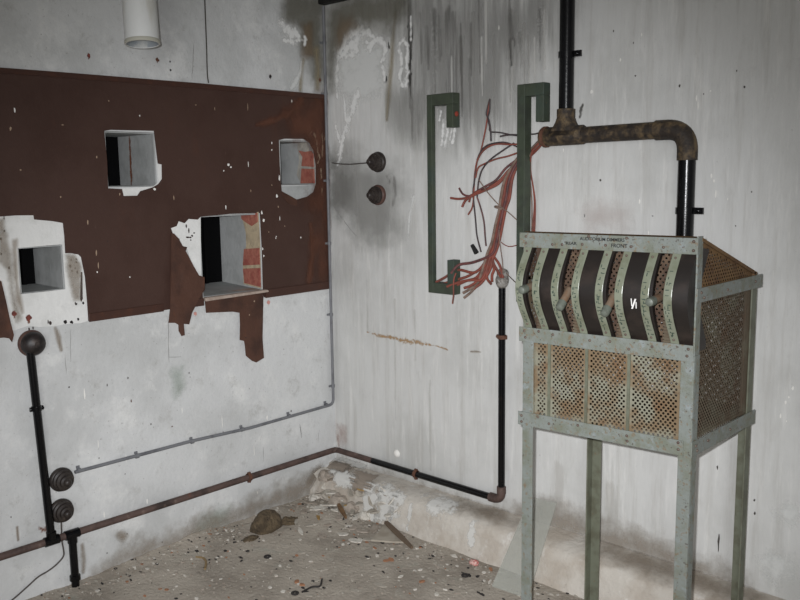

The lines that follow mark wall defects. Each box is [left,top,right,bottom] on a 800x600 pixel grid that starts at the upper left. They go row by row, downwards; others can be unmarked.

water stain [278,0,545,166]
peeling [119,164,162,196]
spalling [271,133,325,227]
peeling [0,215,88,330]
peeling [171,217,201,276]
spalling [241,211,265,288]
corrosion [367,332,448,350]
spalling [294,457,399,543]